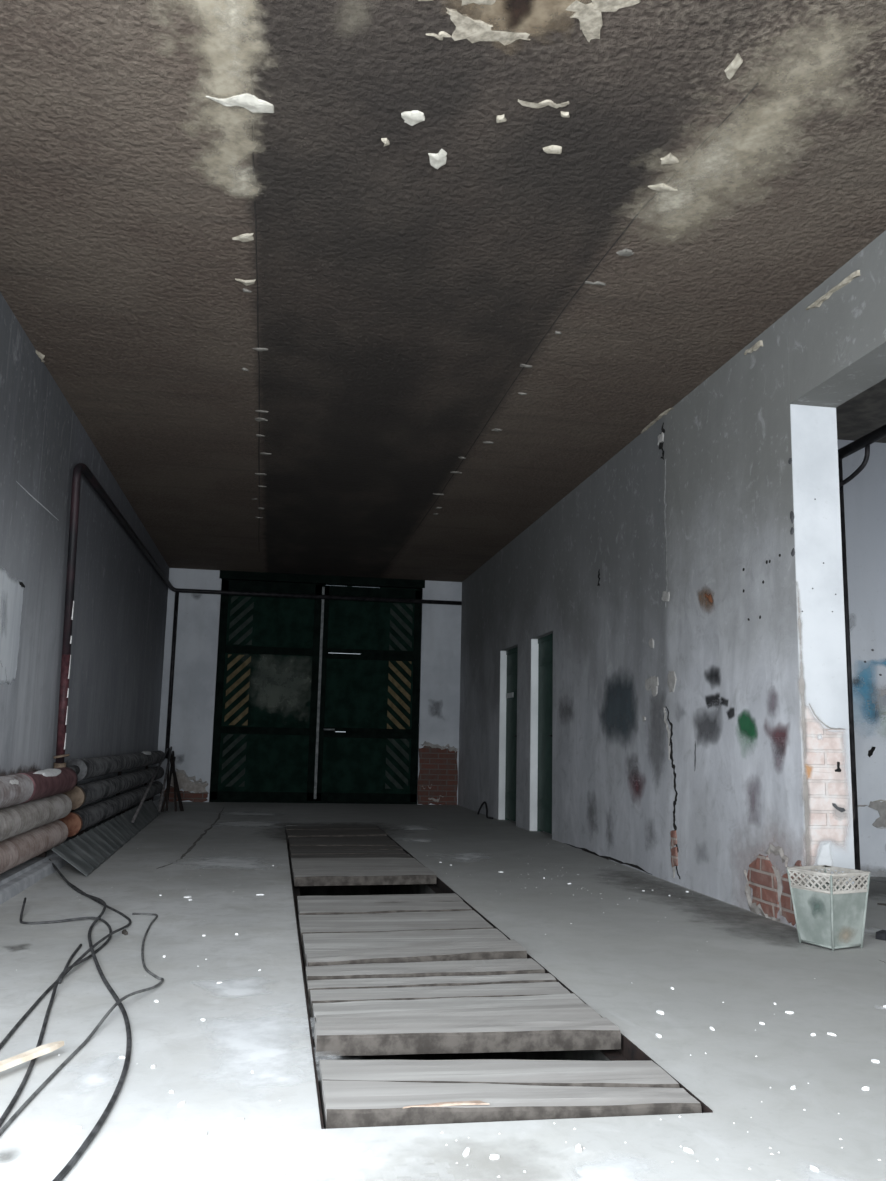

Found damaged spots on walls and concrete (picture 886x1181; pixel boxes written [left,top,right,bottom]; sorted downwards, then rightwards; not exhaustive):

damp [181,0,262,196]
flaking render [426,0,641,46]
flaking render [518,99,570,118]
damp [658,19,844,238]
crack [658,422,668,607]
flaking render [417,741,458,805]
peeling [744,703,849,926]
flaking render [867,800,886,828]